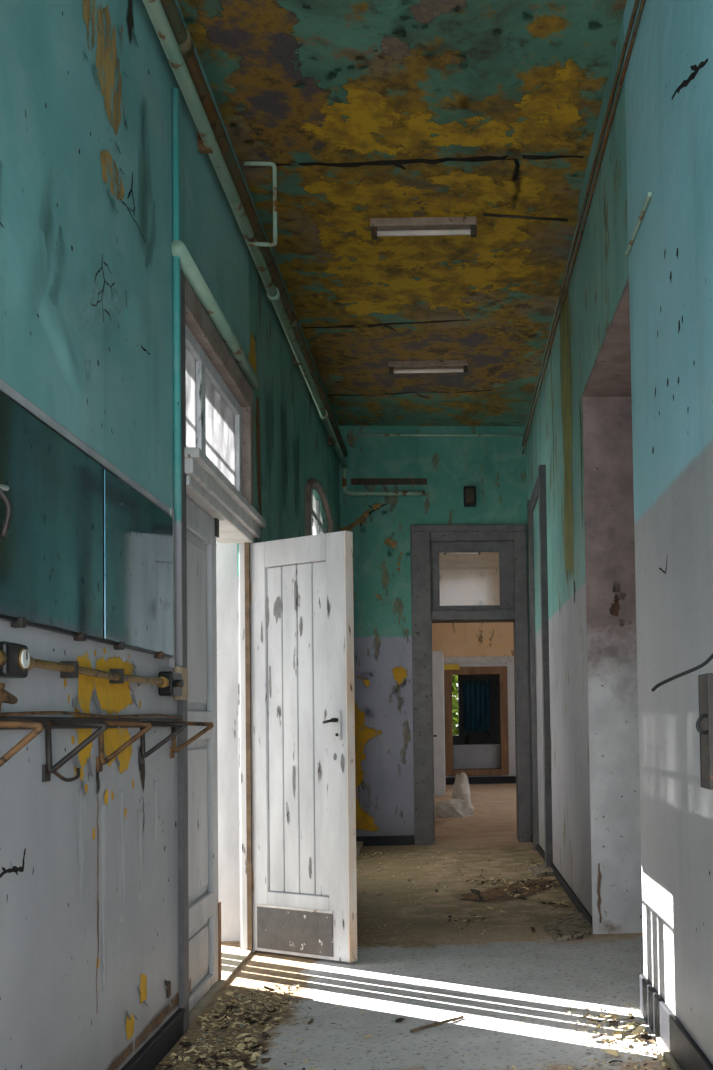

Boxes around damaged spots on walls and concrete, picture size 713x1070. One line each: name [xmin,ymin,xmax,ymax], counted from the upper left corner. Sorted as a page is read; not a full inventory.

peeling [83,0,139,213]
peeling [184,0,595,170]
crack [275,155,584,180]
peeling [290,170,572,396]
peeling [255,390,265,528]
peeling [64,647,141,796]
peeling [333,701,382,832]